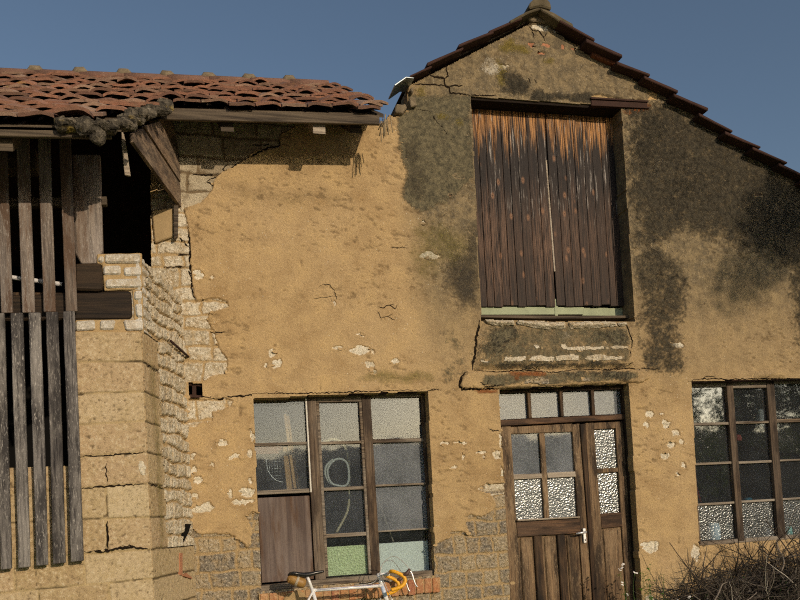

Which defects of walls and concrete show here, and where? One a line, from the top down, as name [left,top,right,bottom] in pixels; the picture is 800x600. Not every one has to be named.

crack [416,64,496,96]
peeling [150,121,294,382]
leakage [451,232,479,302]
mould [624,99,800,373]
spalling [332,333,377,374]
crack [459,320,657,391]
crack [202,389,438,400]
spalling [643,411,685,460]
peeling [177,426,515,600]